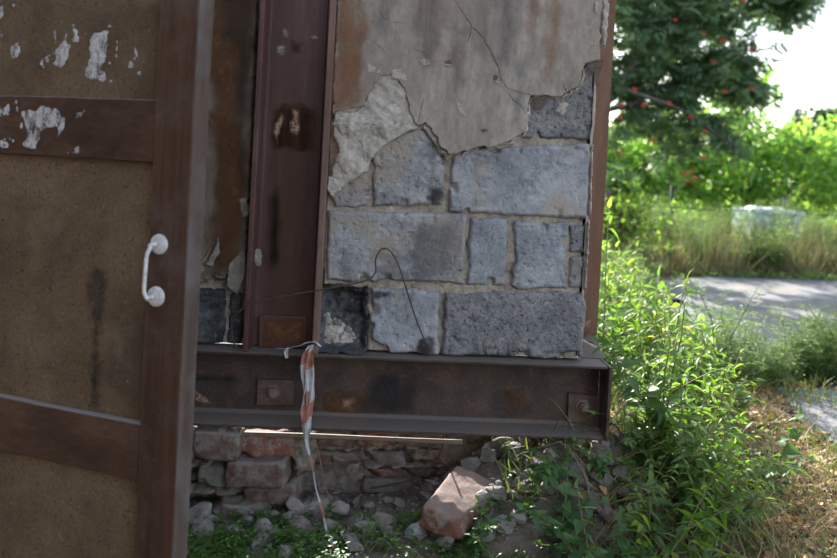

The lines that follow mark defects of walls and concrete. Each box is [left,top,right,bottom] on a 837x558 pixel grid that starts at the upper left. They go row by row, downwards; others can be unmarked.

peeling [40,24,79,67]
peeling [85,25,118,82]
crack [455,0,530,114]
peeling [0,100,65,149]
corrosion [209,0,251,266]
peeling [327,62,590,196]
spalling [581,144,594,292]
spalling [200,238,262,294]
spalling [318,284,370,355]